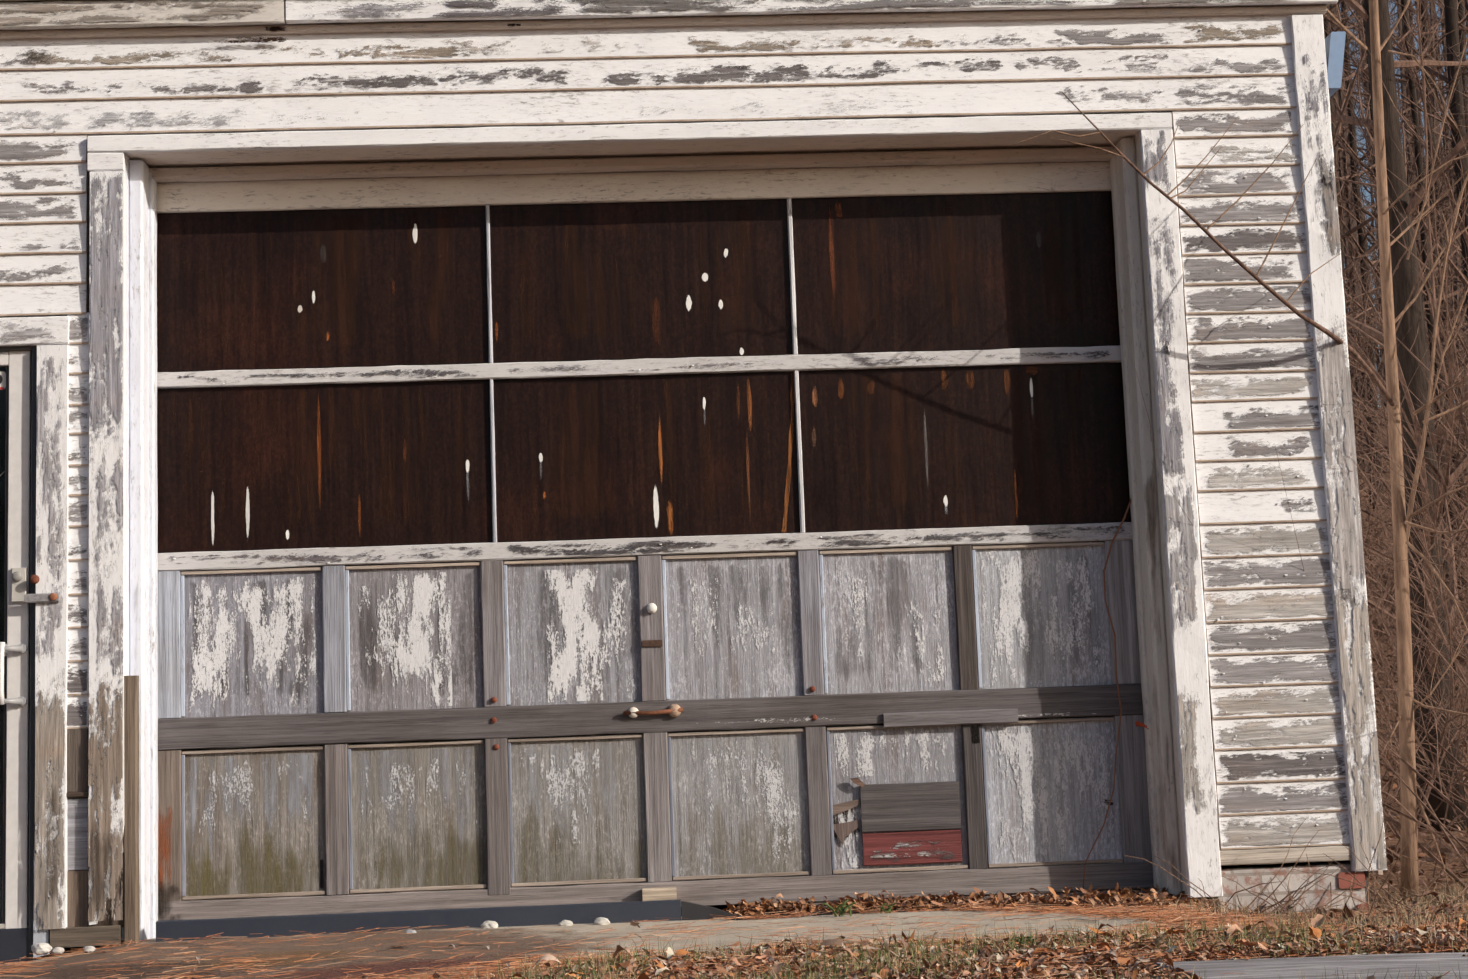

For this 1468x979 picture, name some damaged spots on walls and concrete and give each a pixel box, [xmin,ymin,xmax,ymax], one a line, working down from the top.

peeling [0,1,266,25]
peeling [304,0,1236,17]
peeling [0,37,643,95]
peeling [178,369,478,384]
peeling [510,365,602,373]
peeling [604,22,1387,870]
peeling [170,487,482,710]
peeling [507,487,800,703]
peeling [195,760,256,835]
peeling [361,758,477,816]
peeling [519,748,599,844]